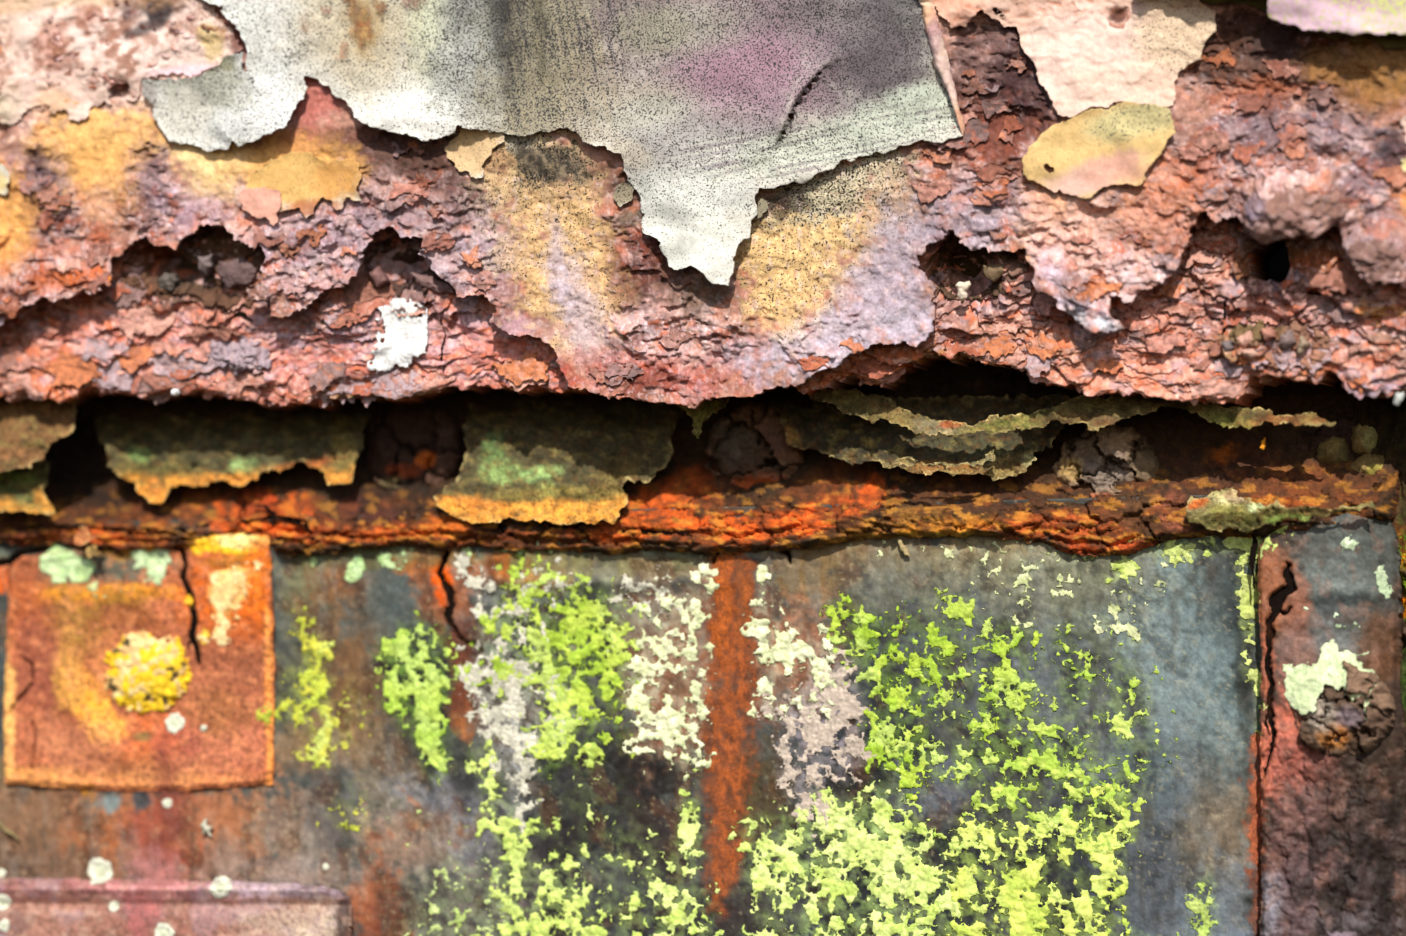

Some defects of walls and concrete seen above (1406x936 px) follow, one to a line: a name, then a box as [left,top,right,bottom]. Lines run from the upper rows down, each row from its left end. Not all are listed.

peeling [0,0,1406,286]
peeling [0,152,457,516]
peeling [320,172,497,329]
peeling [433,352,729,525]
spalling [932,228,1124,379]
peeling [763,266,1371,481]
crack [0,489,366,665]
crack [437,550,479,651]
rust [702,552,759,911]
crack [1249,534,1296,777]
rust [122,787,176,936]
rust [1247,732,1266,935]